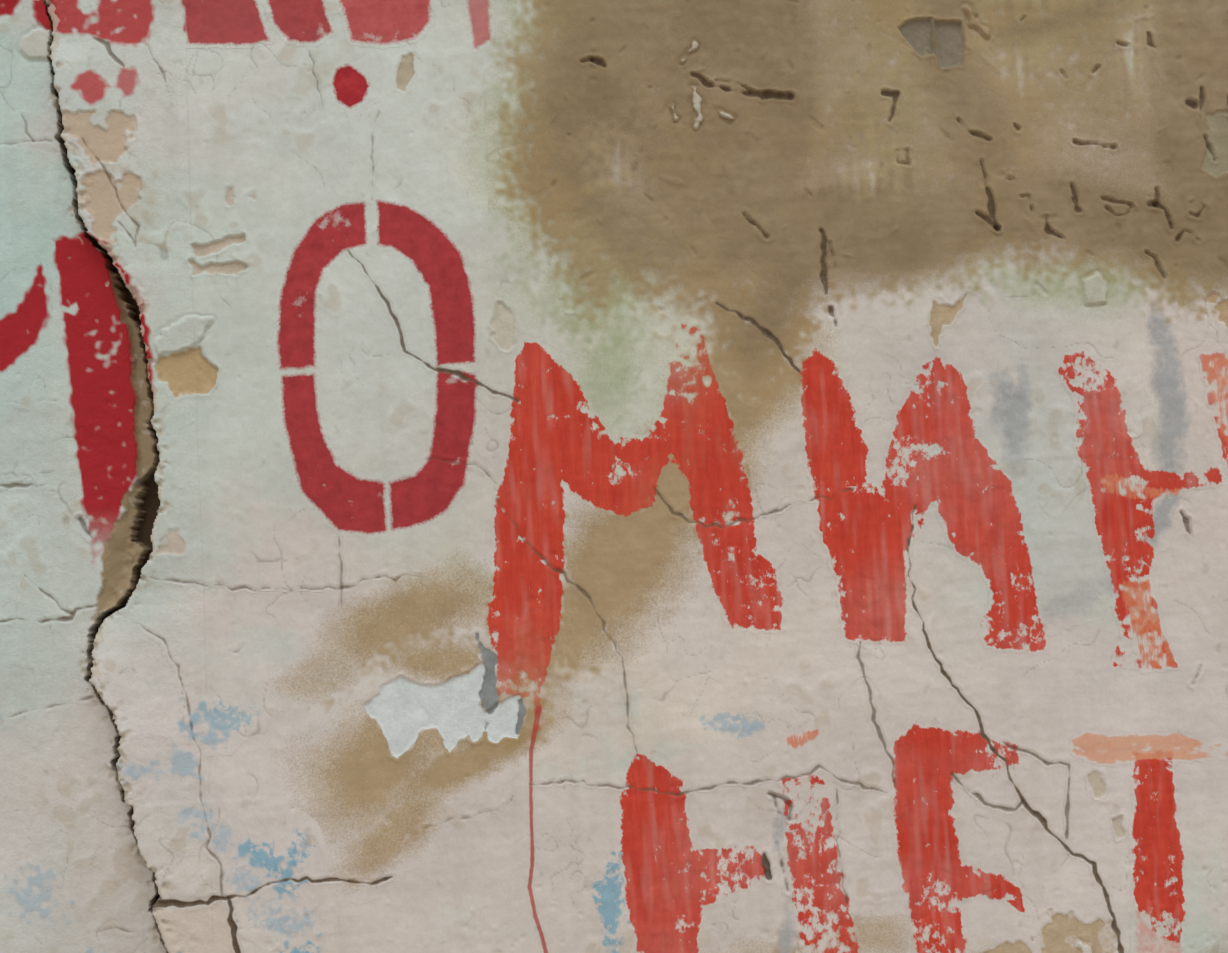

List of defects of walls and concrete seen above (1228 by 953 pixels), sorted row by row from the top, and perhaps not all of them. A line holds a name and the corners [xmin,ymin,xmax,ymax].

peeling [896,3,992,69]
peeling [191,232,250,277]
peeling [193,314,221,397]
crack [0,0,898,953]
peeling [362,630,529,761]
crack [904,504,1125,953]
peeling [983,908,1116,953]